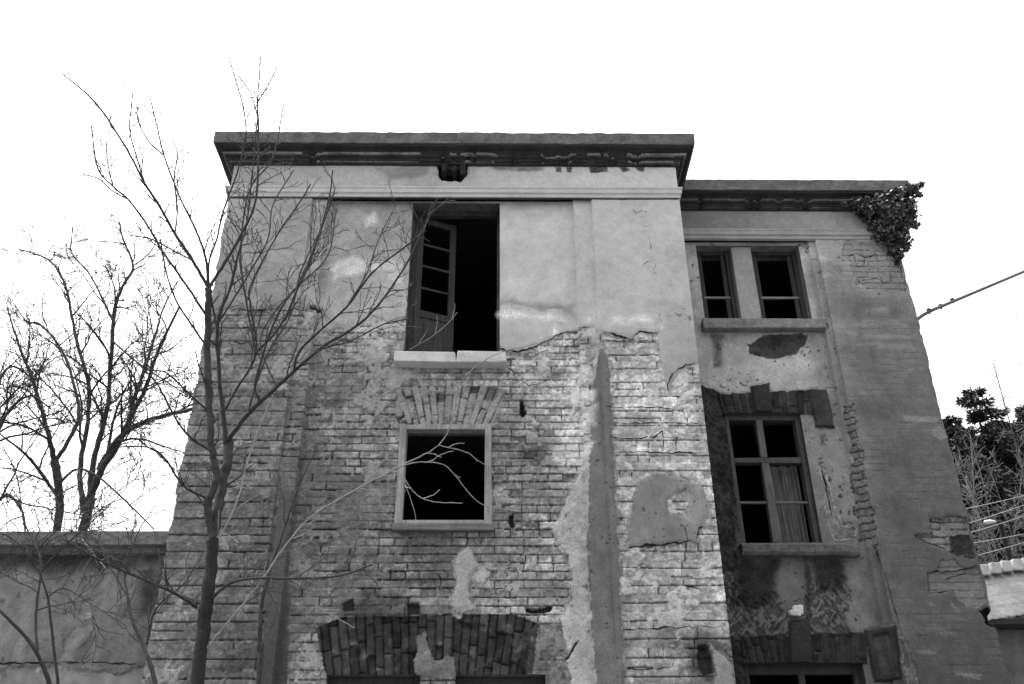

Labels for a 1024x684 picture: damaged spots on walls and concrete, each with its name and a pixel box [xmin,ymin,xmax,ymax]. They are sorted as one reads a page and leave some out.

spalling [838,240,908,295]
crack [497,327,657,390]
crack [609,363,703,454]
spalling [495,326,853,684]
crack [819,463,832,516]
spalling [818,403,879,547]
spalling [915,515,977,559]
hole [342,597,355,612]
hole [407,601,421,616]
spalling [452,548,478,614]
water stain [733,559,779,609]
water stain [805,560,846,596]